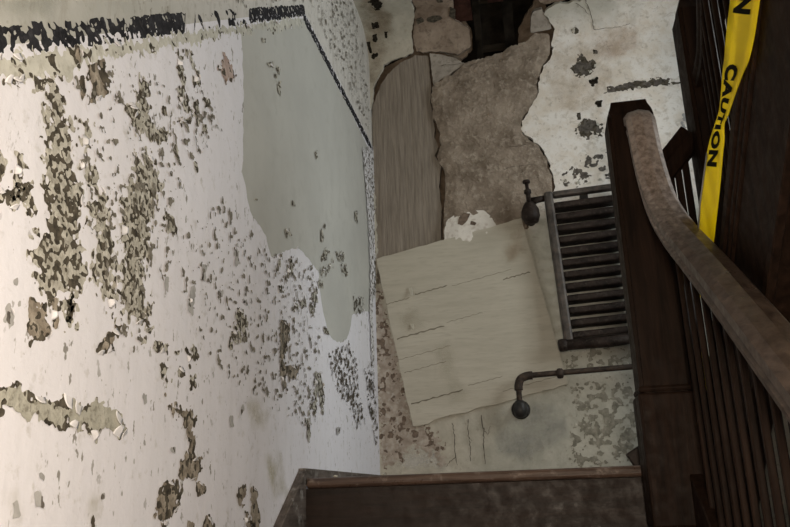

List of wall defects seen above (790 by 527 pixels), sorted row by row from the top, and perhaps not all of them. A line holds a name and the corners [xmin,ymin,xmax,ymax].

peeling [0,0,610,527]
peeling [563,346,637,468]